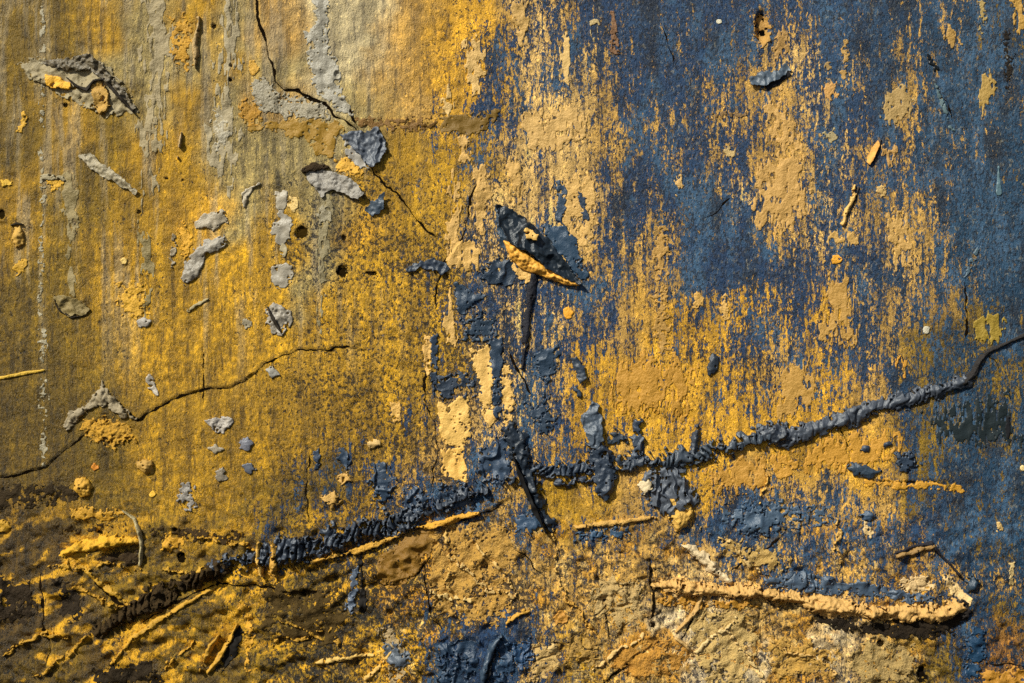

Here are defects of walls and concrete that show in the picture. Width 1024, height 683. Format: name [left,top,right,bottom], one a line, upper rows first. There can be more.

peeling [42,53,136,115]
crack [256,0,359,130]
peeling [405,134,583,285]
peeling [550,173,599,265]
crack [120,307,363,422]
crack [0,420,98,478]
spalling [320,471,352,509]
peeling [110,585,218,665]
spalling [374,522,525,630]
spalling [526,570,919,683]
spalling [697,524,792,572]
peeling [899,573,973,606]